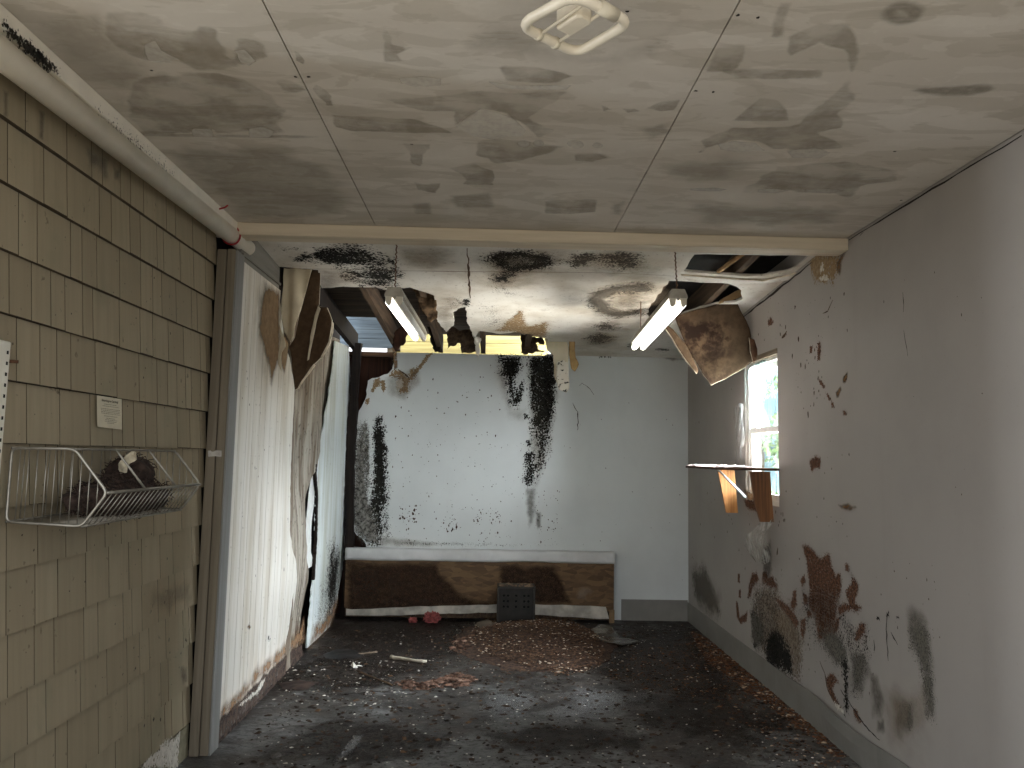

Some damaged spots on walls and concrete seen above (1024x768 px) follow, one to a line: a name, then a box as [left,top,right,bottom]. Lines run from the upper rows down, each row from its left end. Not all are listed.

water stain [278,243,406,291]
flaking render [808,254,844,287]
flaking render [365,347,433,405]
water stain [354,414,393,547]
water stain [495,352,558,527]
water stain [218,536,486,744]
water stain [501,565,569,604]
flaking render [736,543,879,740]
water stain [898,614,936,731]